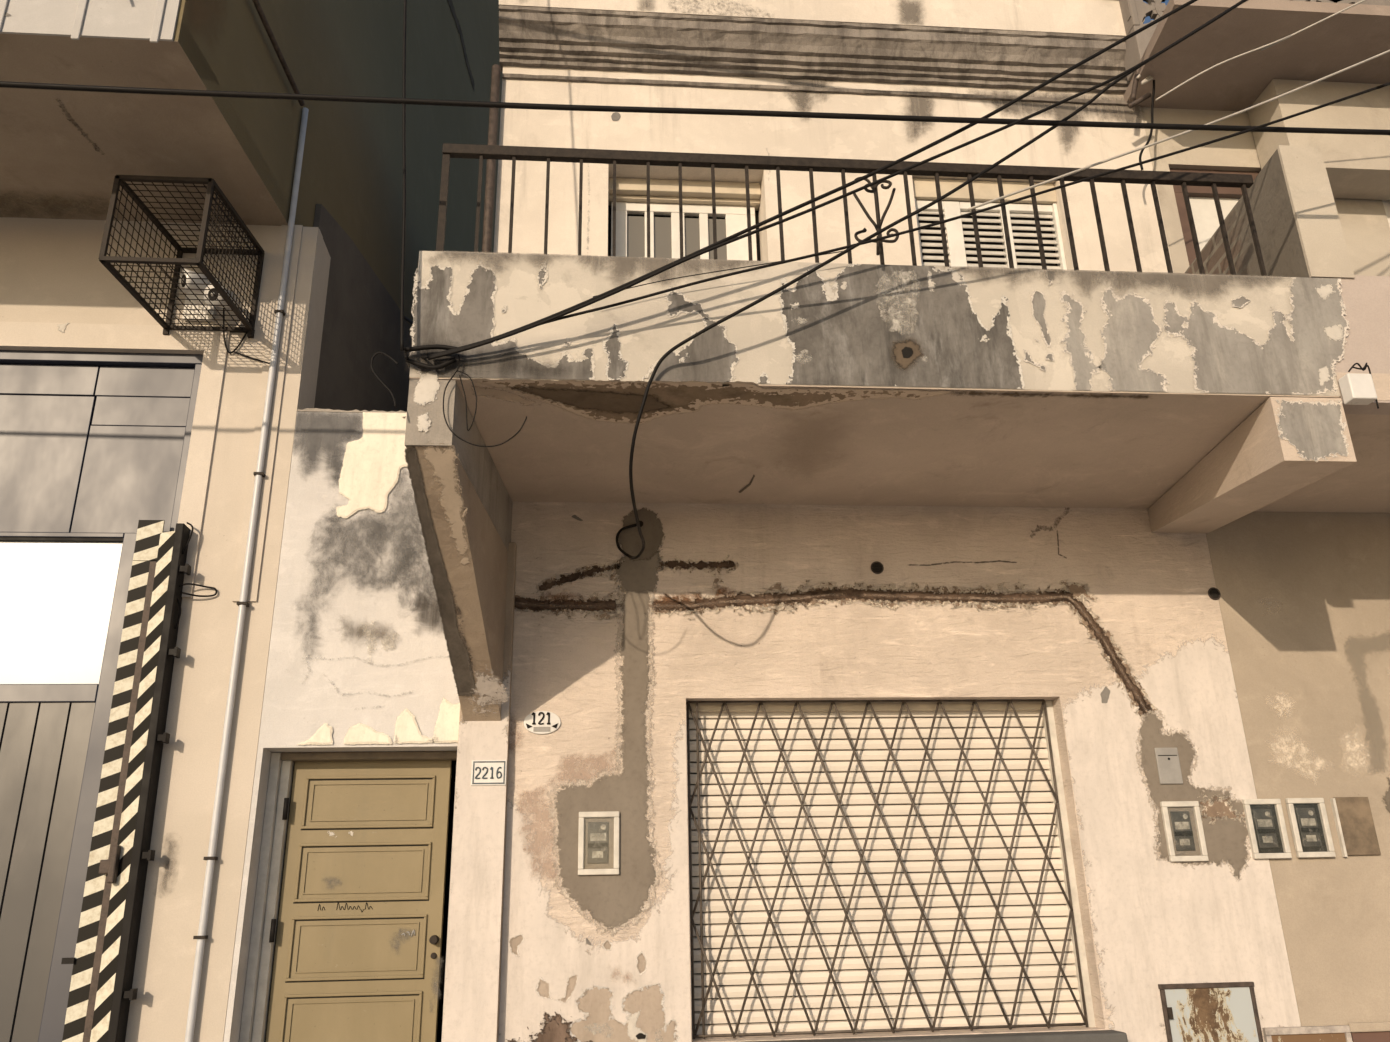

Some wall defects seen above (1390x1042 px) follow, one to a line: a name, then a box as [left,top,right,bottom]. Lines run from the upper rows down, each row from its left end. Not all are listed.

water stain [900,0,920,24]
water stain [293,411,362,482]
peeling [336,260,1350,565]
water stain [315,473,443,628]
water stain [347,625,385,638]
crack [514,508,1167,728]
peeling [297,697,460,745]
peeling [535,951,680,1042]